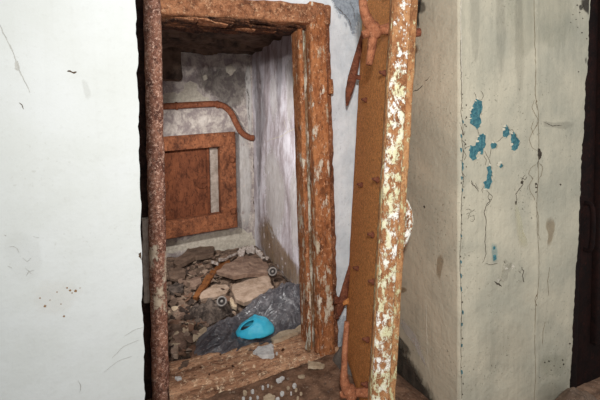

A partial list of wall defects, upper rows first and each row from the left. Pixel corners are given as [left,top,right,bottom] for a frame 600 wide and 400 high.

crack [0,26,30,92]
rust [161,16,277,33]
peeling [466,91,521,190]
crack [515,15,543,249]
crack [460,40,497,347]
crack [535,268,550,344]